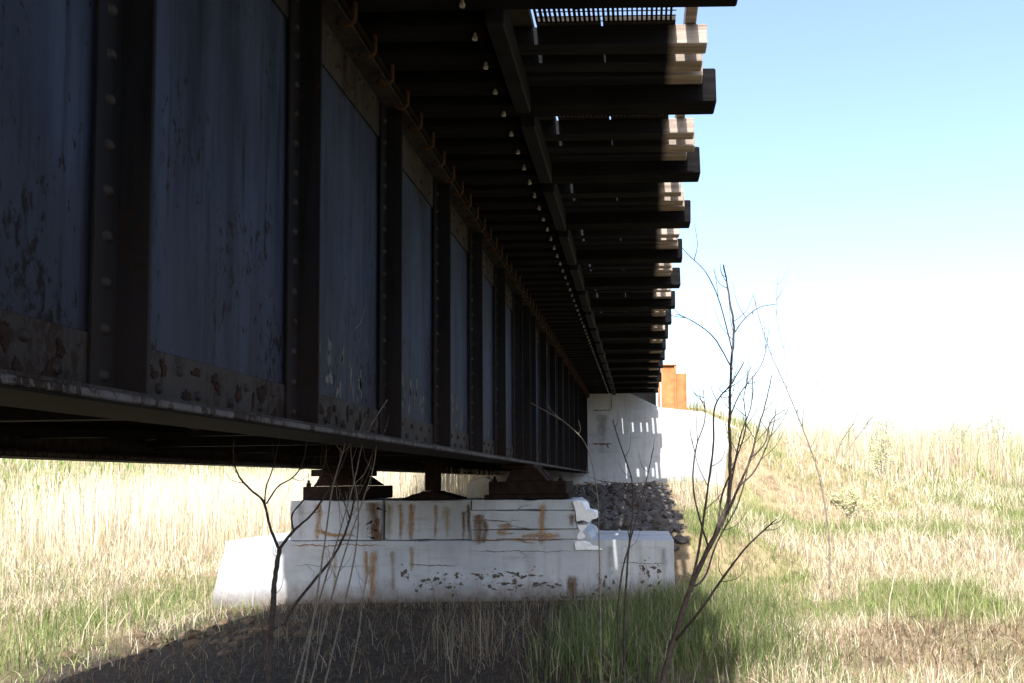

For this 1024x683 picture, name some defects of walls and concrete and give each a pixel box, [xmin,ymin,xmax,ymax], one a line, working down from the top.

rust [369,503,381,541]
rust [399,504,414,567]
rust [462,505,509,542]
spalling [573,500,603,550]
rust [365,552,376,594]
peeling [400,564,618,601]